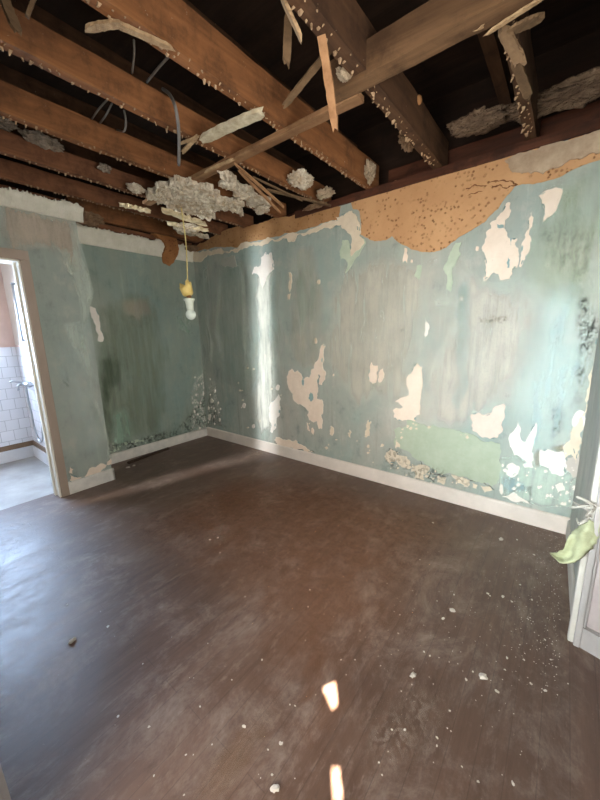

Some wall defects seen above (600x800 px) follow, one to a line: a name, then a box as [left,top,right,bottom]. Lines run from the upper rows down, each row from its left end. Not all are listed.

spalling [193,130,600,292]
crack [466,179,518,195]
peeling [90,306,104,342]
peeling [69,436,155,482]
peeling [246,338,337,453]
peeling [380,358,595,507]